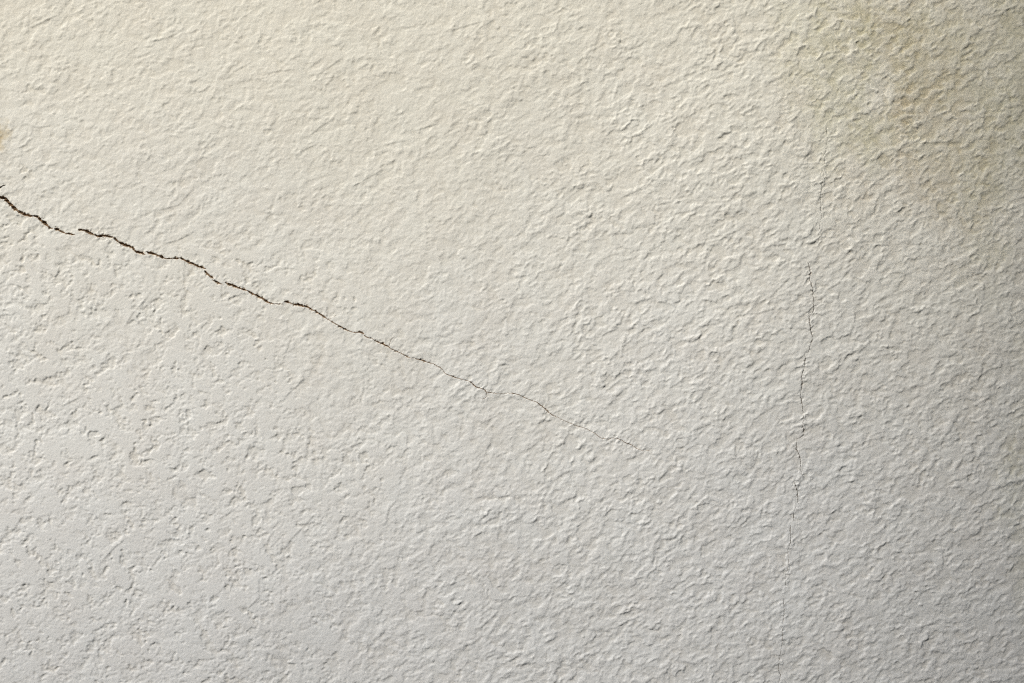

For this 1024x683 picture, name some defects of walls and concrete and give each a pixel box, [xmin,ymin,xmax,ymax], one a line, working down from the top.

crack [0,181,654,455]